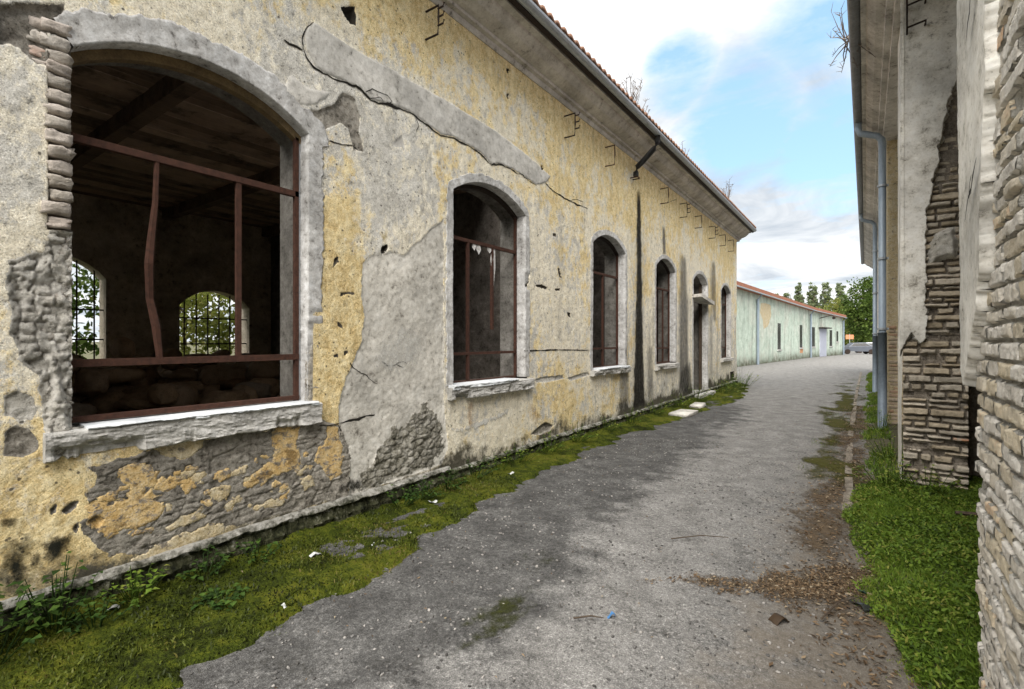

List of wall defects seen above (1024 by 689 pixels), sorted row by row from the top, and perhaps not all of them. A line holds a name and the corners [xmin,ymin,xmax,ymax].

spalling [0,2,84,457]
flaking render [50,219,448,562]
crack [319,414,375,434]
crack [284,22,588,209]
damp [621,194,655,409]
spalling [888,0,1024,689]